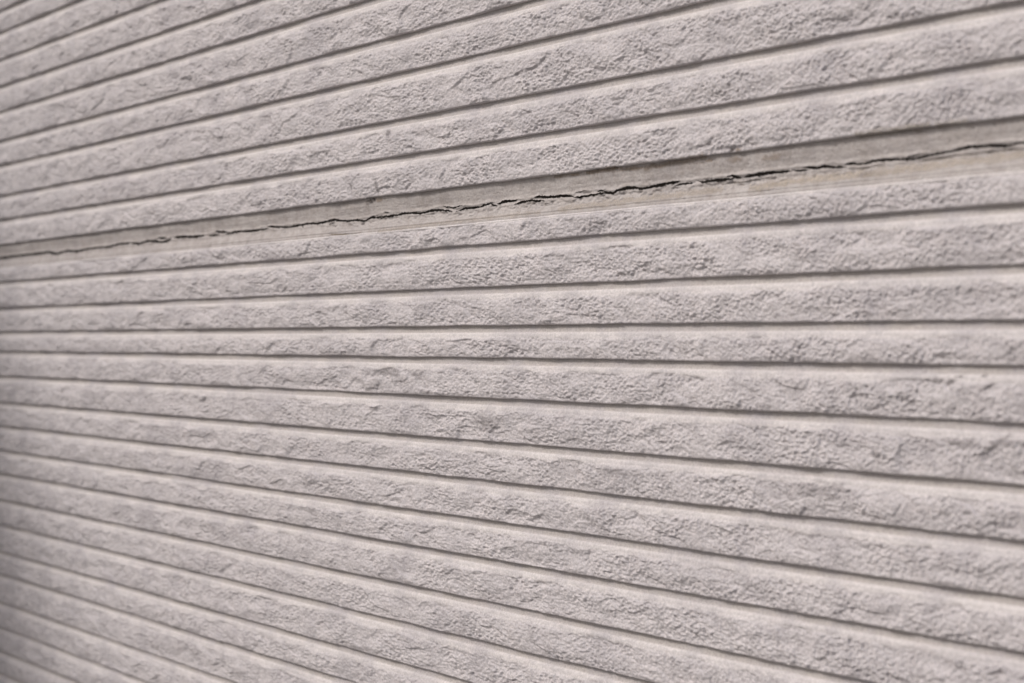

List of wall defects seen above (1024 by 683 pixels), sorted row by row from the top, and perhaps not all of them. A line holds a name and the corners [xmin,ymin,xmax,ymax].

crack [0,141,1024,259]